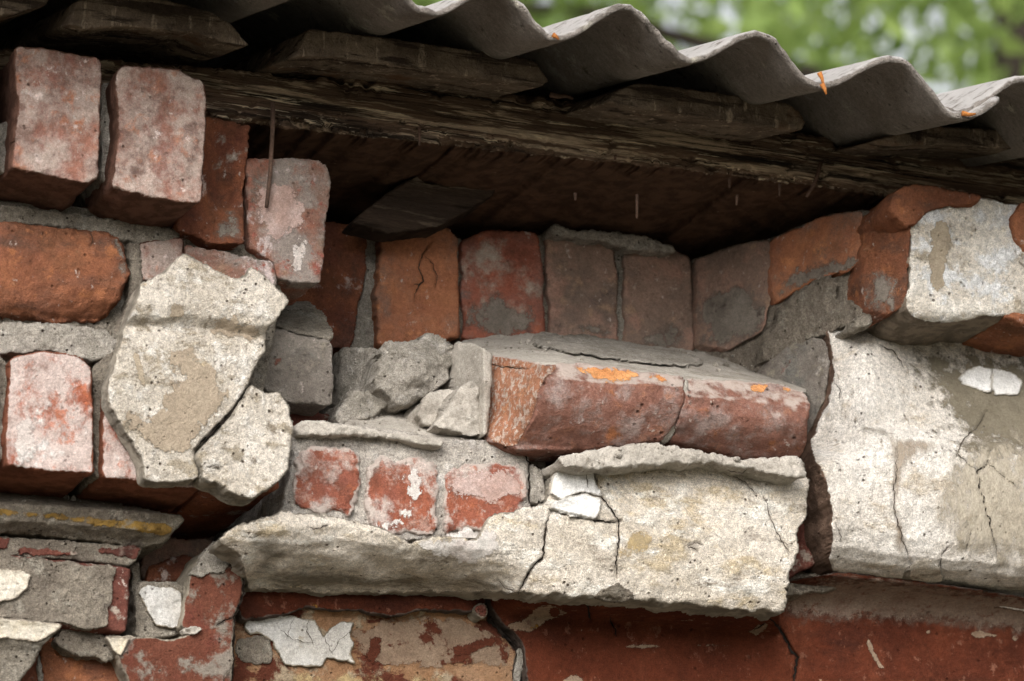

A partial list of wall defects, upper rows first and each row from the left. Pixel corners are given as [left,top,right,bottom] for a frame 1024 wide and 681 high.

crack [414,246,438,300]
crack [194,386,249,468]
crack [940,414,1015,568]
crack [485,456,620,646]
peeling [235,603,567,668]